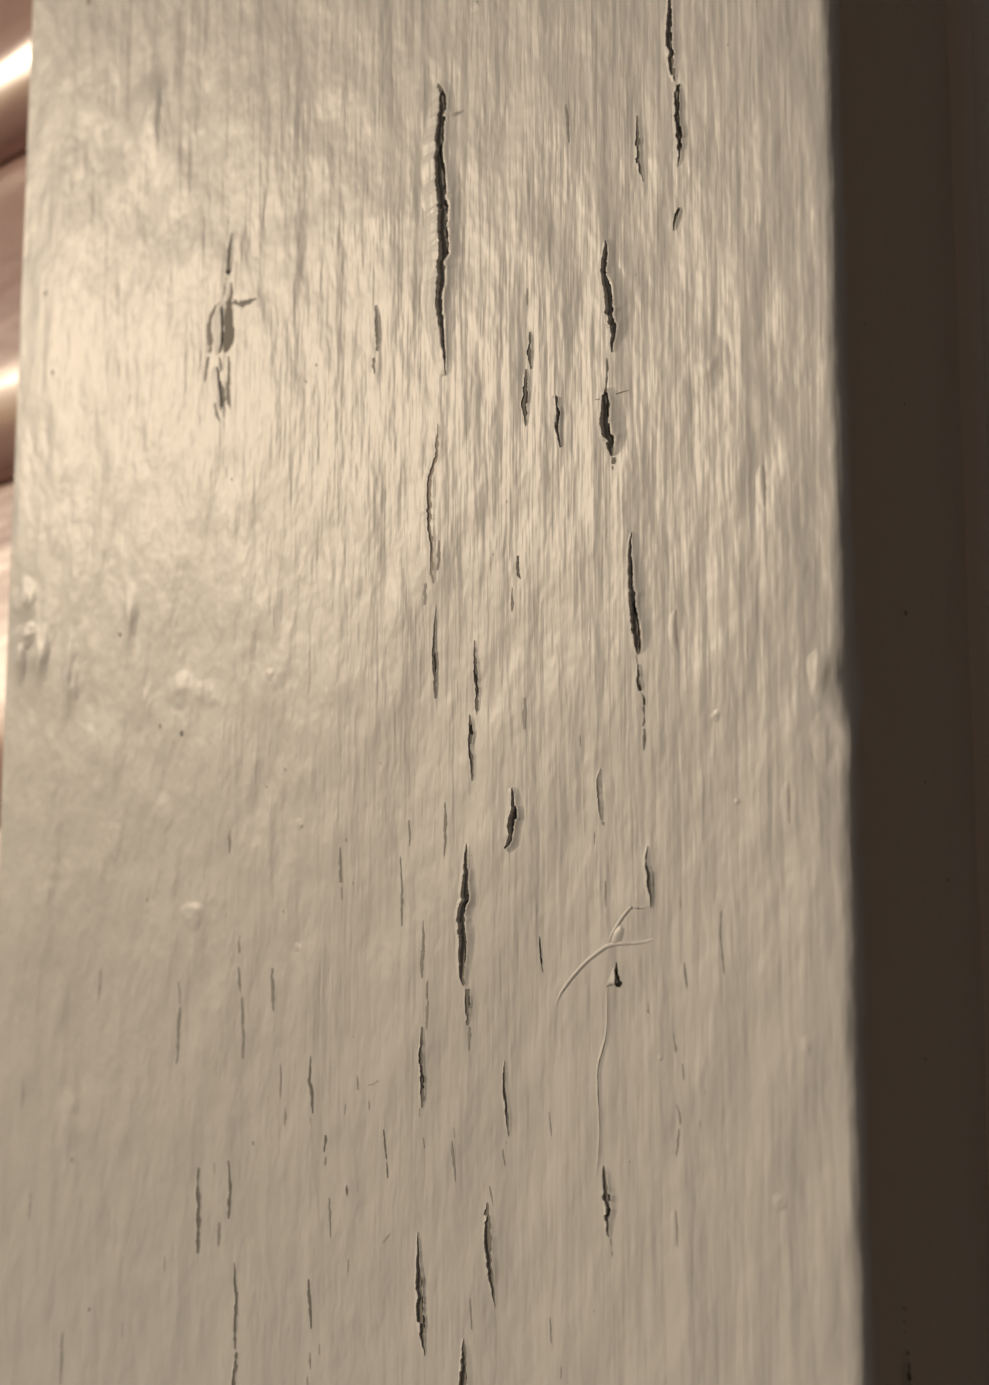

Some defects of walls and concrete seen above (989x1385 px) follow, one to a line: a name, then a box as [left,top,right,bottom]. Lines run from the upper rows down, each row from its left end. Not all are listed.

crack [634,0,688,182]
crack [421,80,465,377]
peeling [211,305,222,411]
crack [520,238,629,470]
crack [421,424,444,699]
crack [466,640,482,781]
crack [510,556,520,611]
crack [625,532,677,751]
crack [400,787,525,1182]
crack [537,936,545,972]
crack [383,1061,551,1385]
crack [595,962,622,1256]